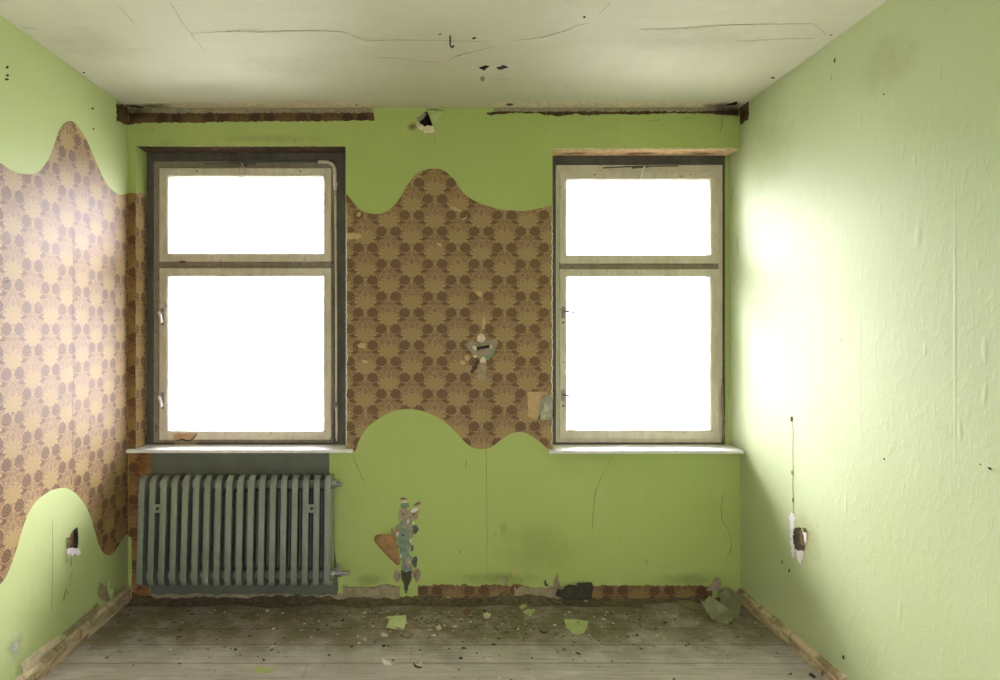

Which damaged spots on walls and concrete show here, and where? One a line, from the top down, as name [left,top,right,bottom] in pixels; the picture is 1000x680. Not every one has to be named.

crack [168,0,492,63]
crack [643,23,825,41]
flaking render [124,102,374,114]
spalling [410,109,444,134]
spalling [460,316,499,380]
peeling [151,433,329,506]
spalling [66,527,81,566]
peeling [149,497,421,600]
spalling [780,498,807,573]